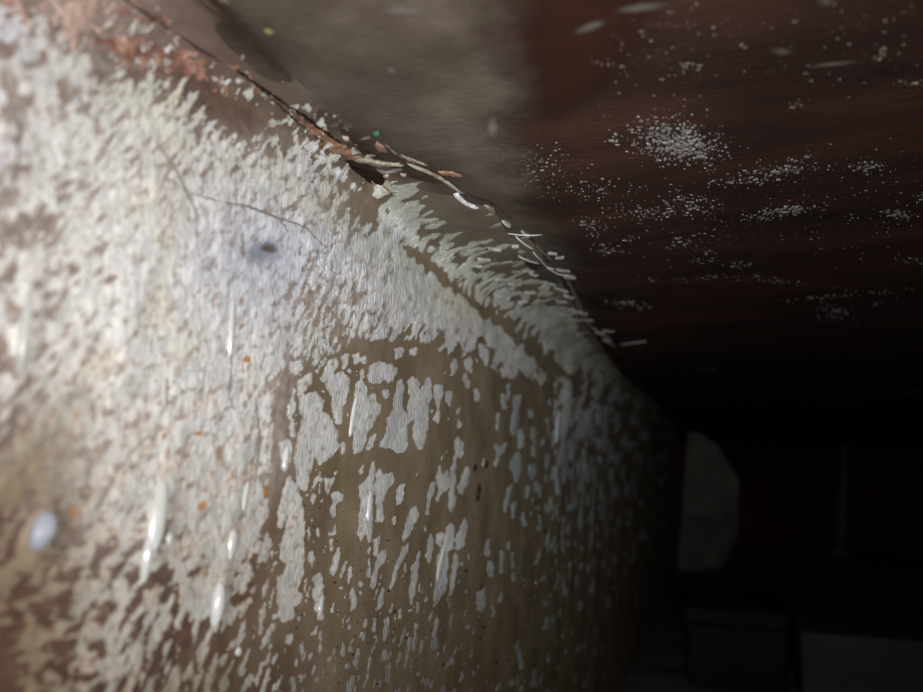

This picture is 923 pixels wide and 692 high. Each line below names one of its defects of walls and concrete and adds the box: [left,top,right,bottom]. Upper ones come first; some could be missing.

crack [155,139,327,248]
crack [125,0,386,156]
peeling [0,0,677,692]
crack [413,163,622,375]
leakage [214,0,896,292]
leakage [879,198,923,221]